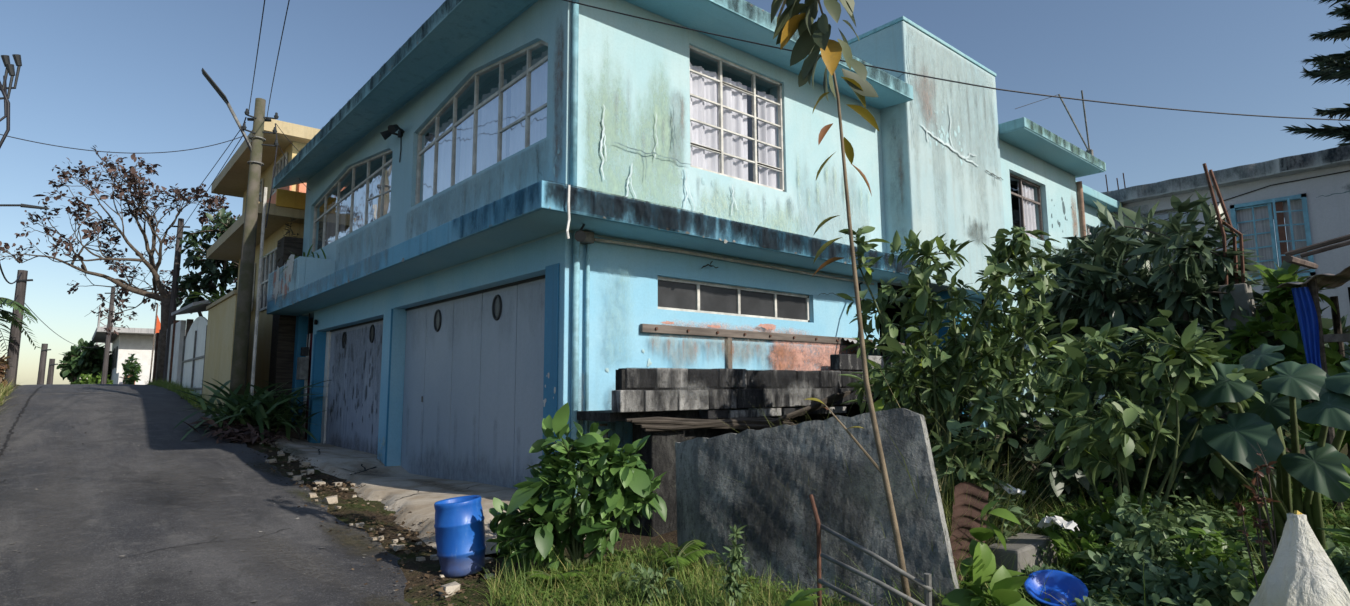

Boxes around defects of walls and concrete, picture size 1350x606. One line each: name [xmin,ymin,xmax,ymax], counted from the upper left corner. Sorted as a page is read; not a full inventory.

water stain [284,3,452,175]
water stain [494,87,916,274]
crack [0,386,42,482]
water stain [728,451,872,585]